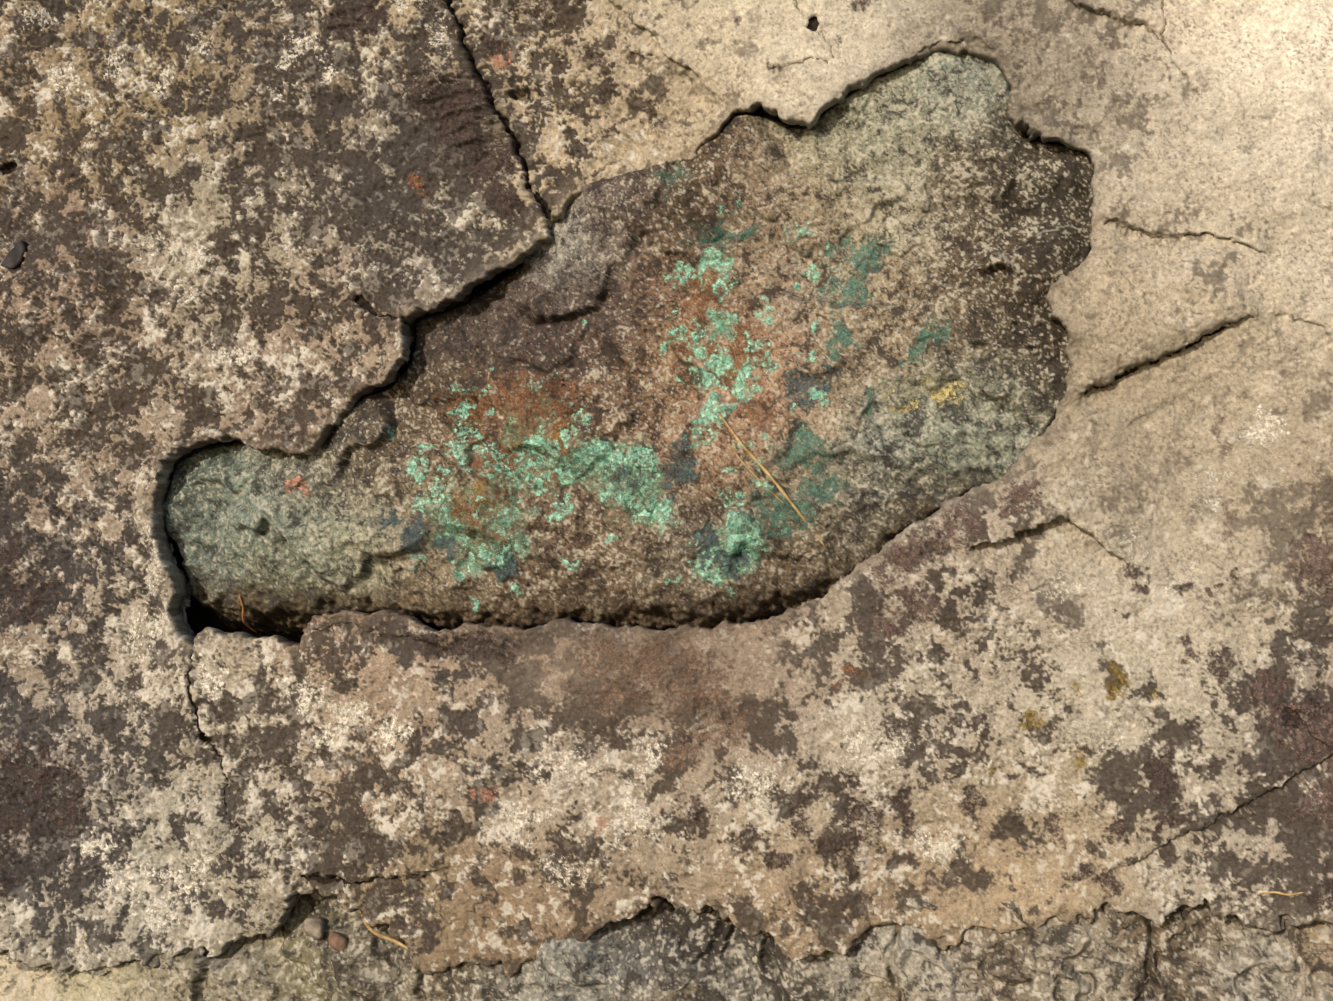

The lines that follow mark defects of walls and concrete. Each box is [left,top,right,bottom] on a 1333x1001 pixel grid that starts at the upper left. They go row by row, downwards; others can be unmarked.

crack [770,0,837,69]
crack [1097,0,1205,98]
crack [446,0,554,229]
crack [1104,221,1262,253]
flaking render [130,0,1333,657]
corrosion [672,272,791,436]
crack [1084,317,1245,395]
corrosion [433,371,592,547]
spalling [1073,890,1316,933]